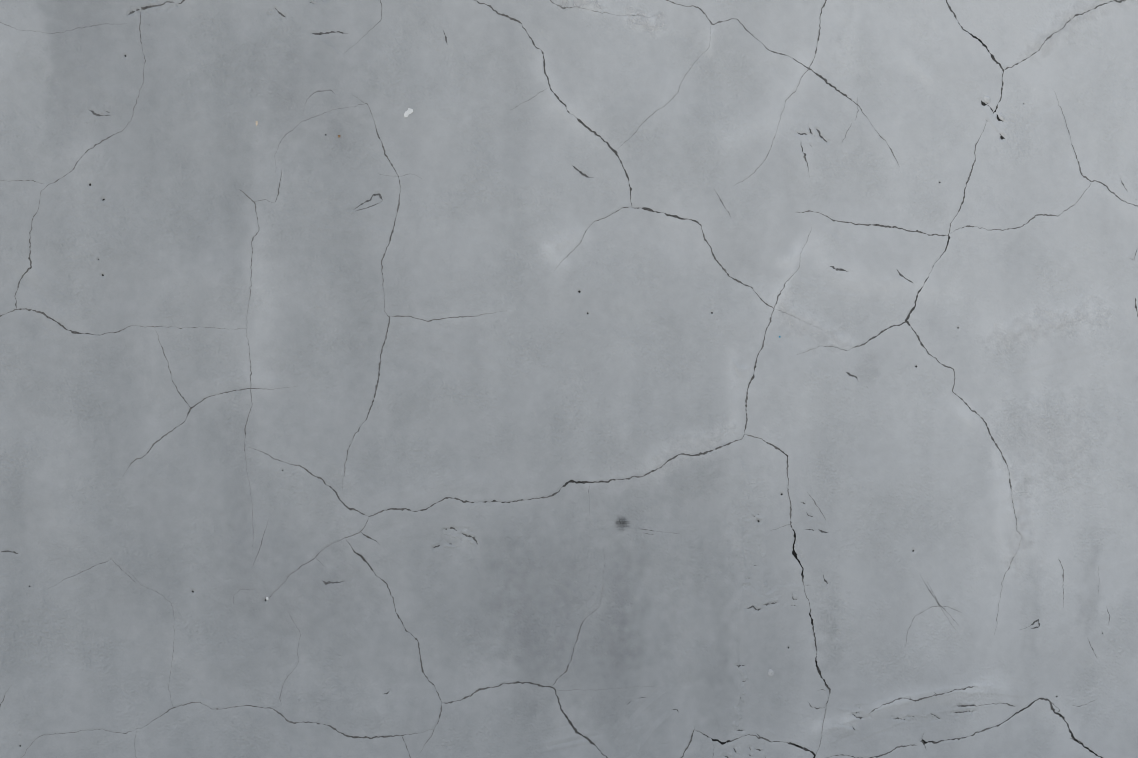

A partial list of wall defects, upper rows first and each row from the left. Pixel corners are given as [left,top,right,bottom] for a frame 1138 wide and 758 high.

crack [666,0,900,182]
crack [0,0,856,758]
crack [797,0,1137,621]
crack [869,686,975,714]
crack [870,698,1103,758]